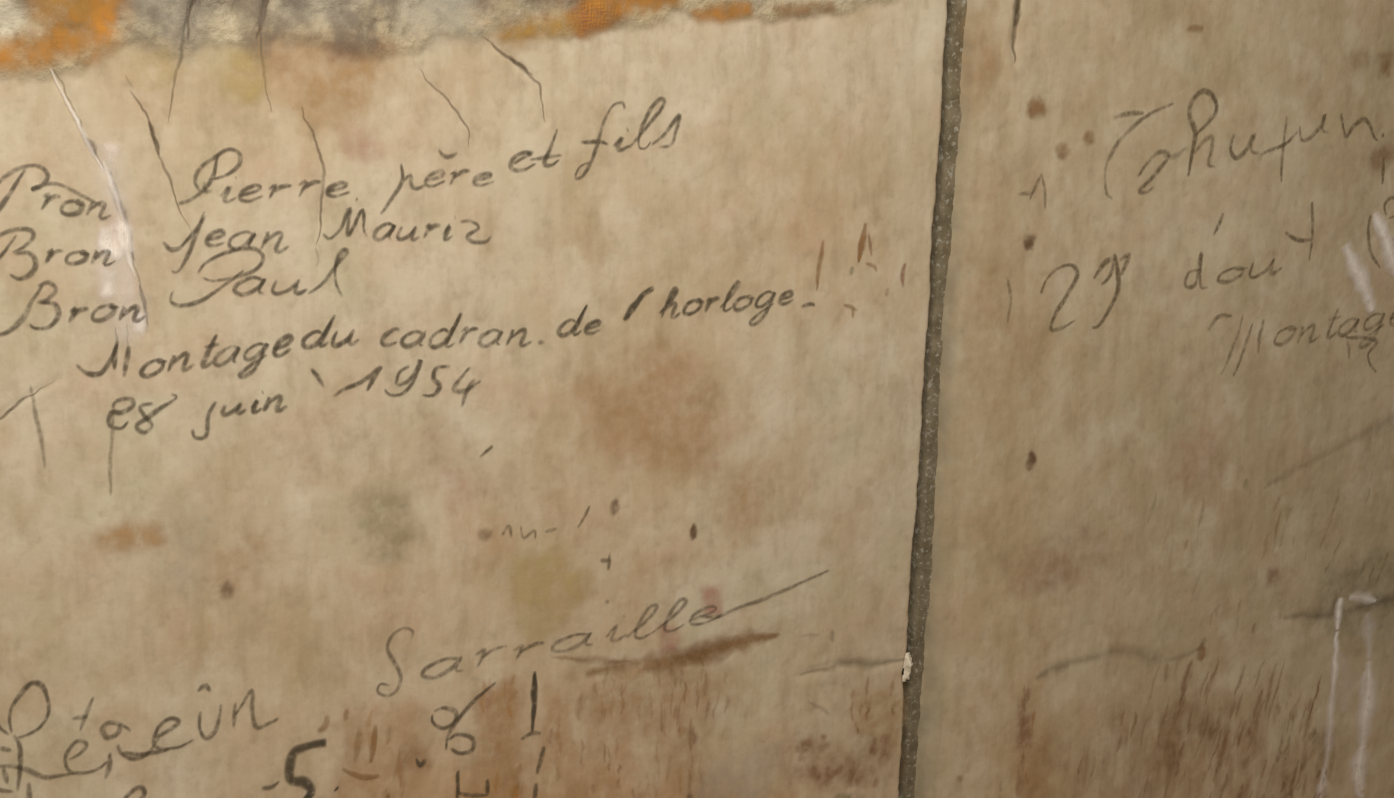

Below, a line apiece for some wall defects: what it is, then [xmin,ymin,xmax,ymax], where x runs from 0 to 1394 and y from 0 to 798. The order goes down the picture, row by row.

corrosion [0,0,126,65]
spalling [0,0,890,276]
peeling [135,312,145,331]